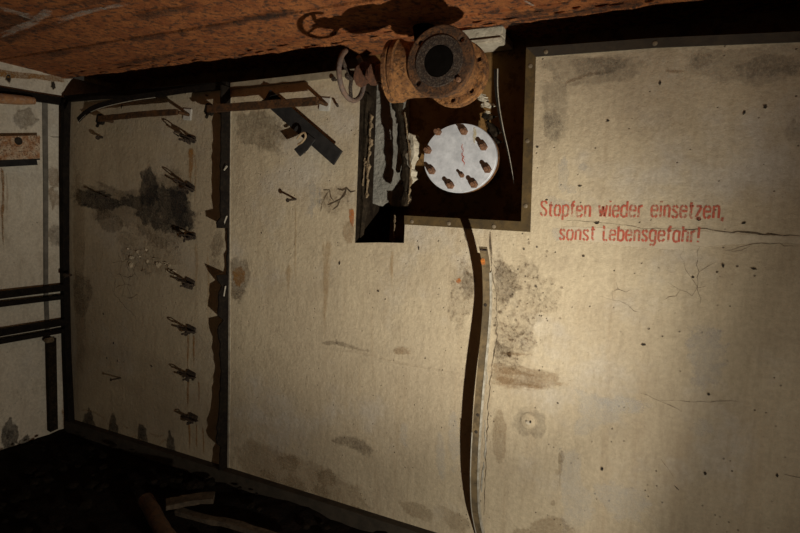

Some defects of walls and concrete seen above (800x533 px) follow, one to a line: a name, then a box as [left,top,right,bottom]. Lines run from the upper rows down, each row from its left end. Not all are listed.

damp [76,168,195,232]
crack [609,223,799,236]
crack [484,232,500,504]